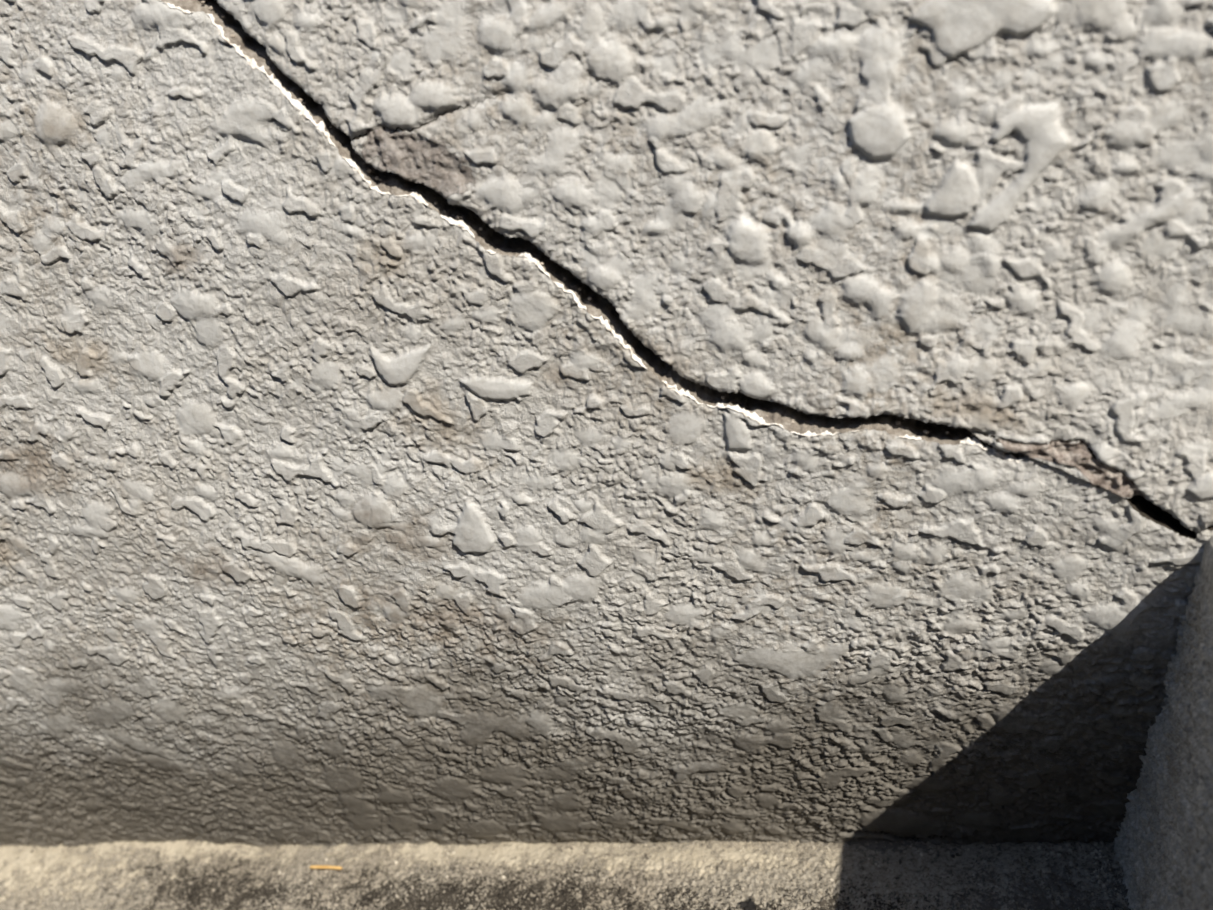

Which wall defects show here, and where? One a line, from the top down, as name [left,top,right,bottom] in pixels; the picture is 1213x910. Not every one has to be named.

crack [159,0,1213,540]